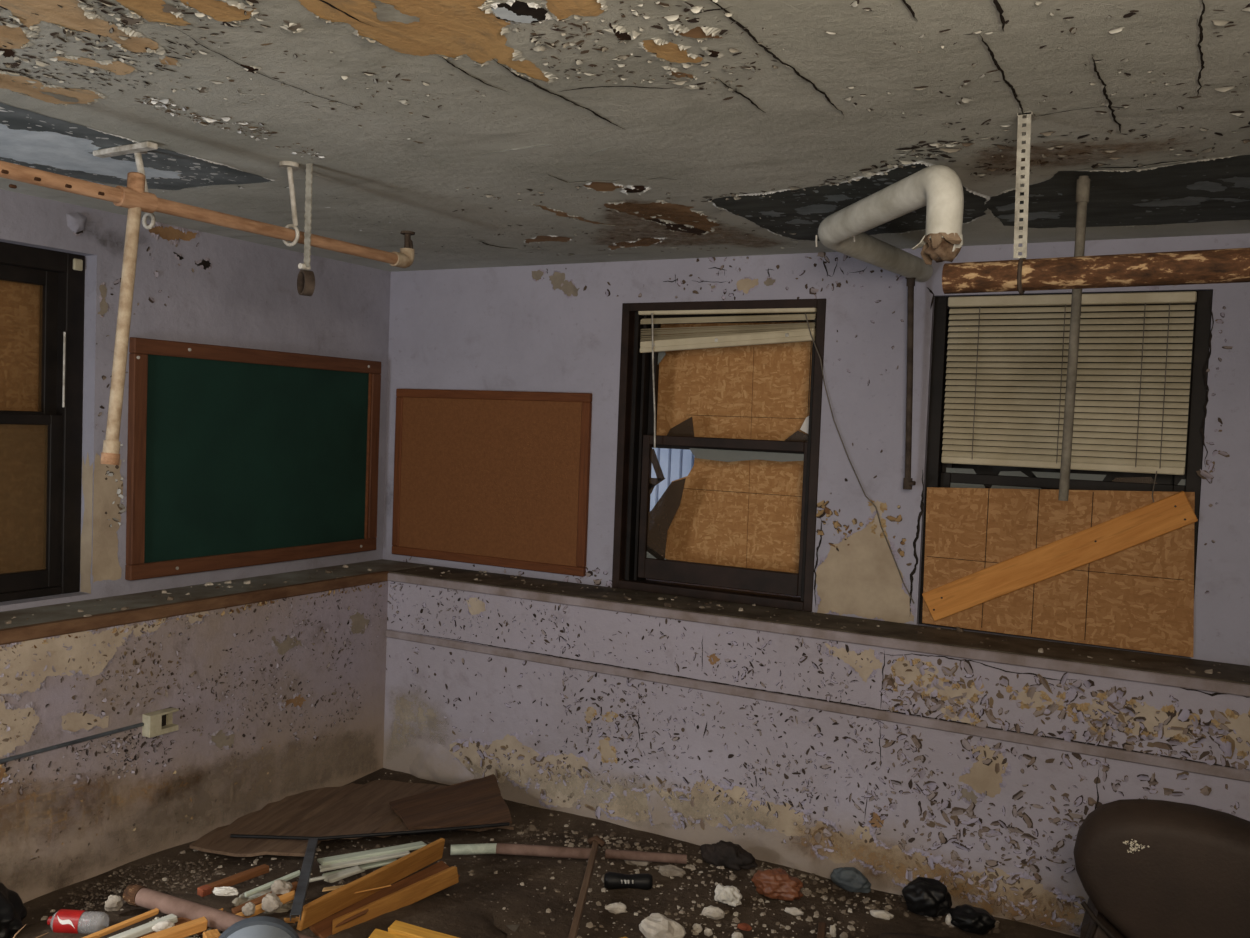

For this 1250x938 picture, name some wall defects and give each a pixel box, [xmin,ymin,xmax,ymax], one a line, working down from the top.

peeling [0,0,470,192]
peeling [299,0,784,100]
crack [439,56,683,128]
crack [693,0,843,116]
crack [901,0,918,22]
crack [963,0,1124,134]
peeling [1107,10,1139,34]
crack [1195,0,1205,96]
peeling [452,63,1250,300]
peeling [816,492,917,623]
damp [0,735,375,853]
peeling [0,582,1250,935]